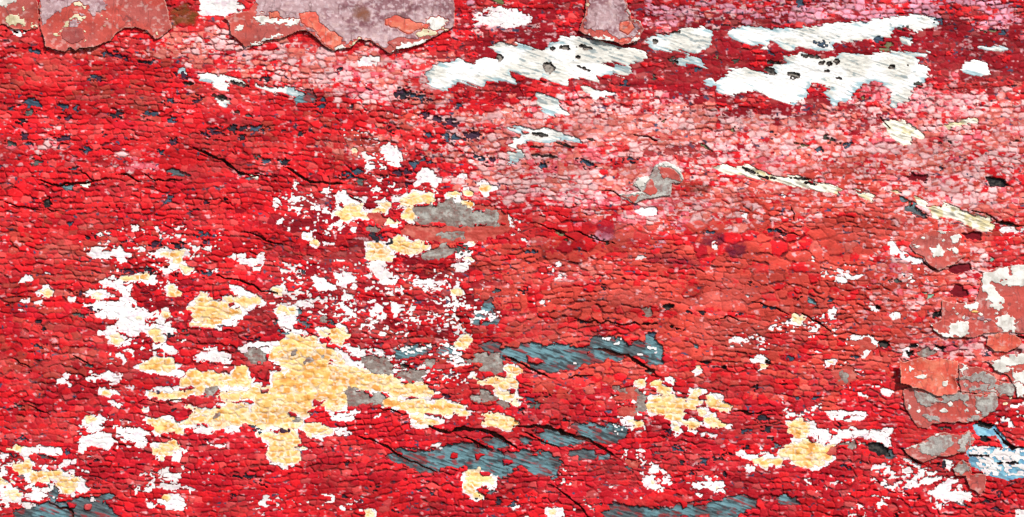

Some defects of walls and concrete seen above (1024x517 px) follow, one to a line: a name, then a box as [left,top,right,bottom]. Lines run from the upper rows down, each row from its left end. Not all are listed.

peeling [0,0,172,65]
peeling [198,0,455,67]
peeling [393,0,957,170]
peeling [939,118,978,144]
crack [6,148,361,211]
peeling [0,126,1024,517]
crack [359,436,436,472]
crack [429,424,614,455]